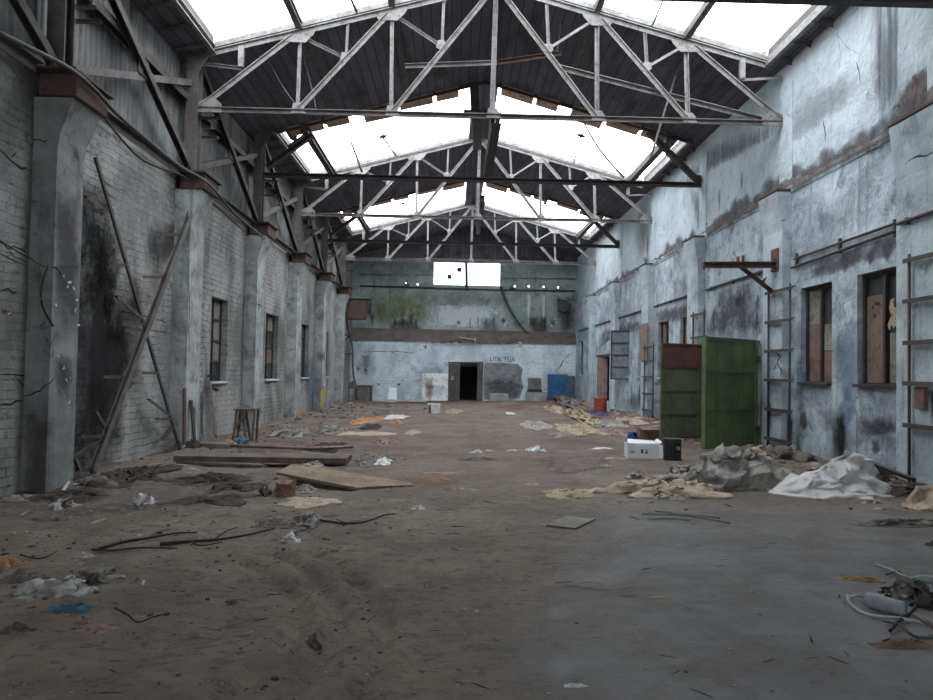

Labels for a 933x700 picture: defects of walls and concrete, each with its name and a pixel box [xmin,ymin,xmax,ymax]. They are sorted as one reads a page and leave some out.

crack [0,139,48,171]
damp [687,138,755,182]
crack [0,242,27,264]
crack [0,374,56,406]